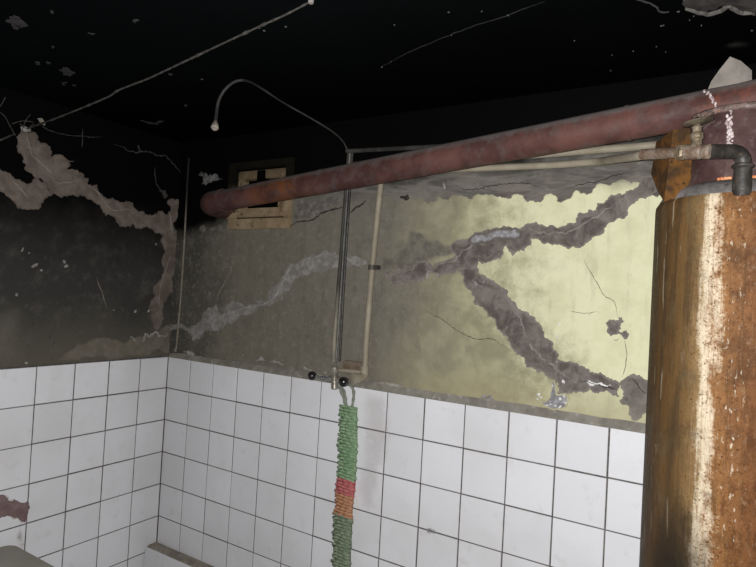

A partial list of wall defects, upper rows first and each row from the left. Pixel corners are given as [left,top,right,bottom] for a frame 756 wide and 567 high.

spalling [682,0,756,17]
crack [291,201,365,225]
peeling [0,131,179,331]
peeling [378,151,660,421]
water stain [537,377,570,410]
spalling [0,494,30,523]